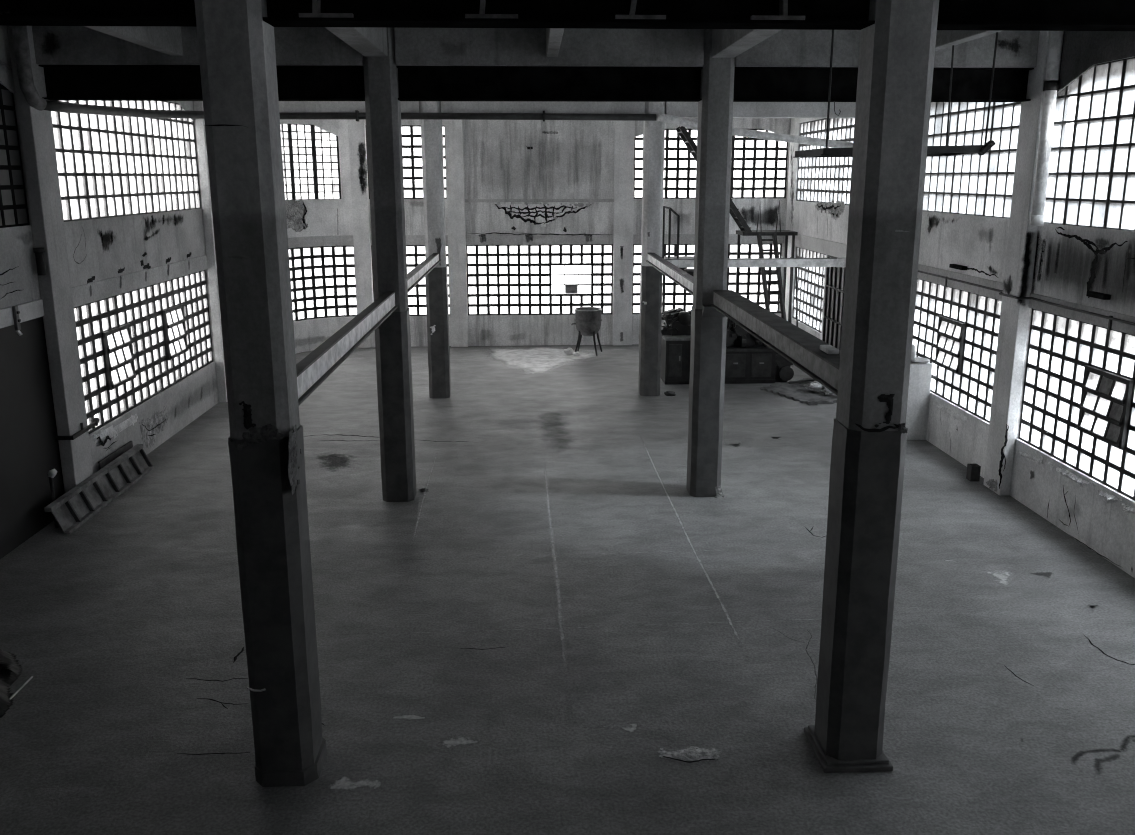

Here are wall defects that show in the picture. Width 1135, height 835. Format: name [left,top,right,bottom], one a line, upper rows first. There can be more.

peeling [285,199,308,232]
flaking render [495,202,592,232]
crack [1055,227,1134,298]
crack [0,266,21,299]
crack [855,423,905,432]
crack [998,424,1009,489]
crack [1083,634,1135,665]